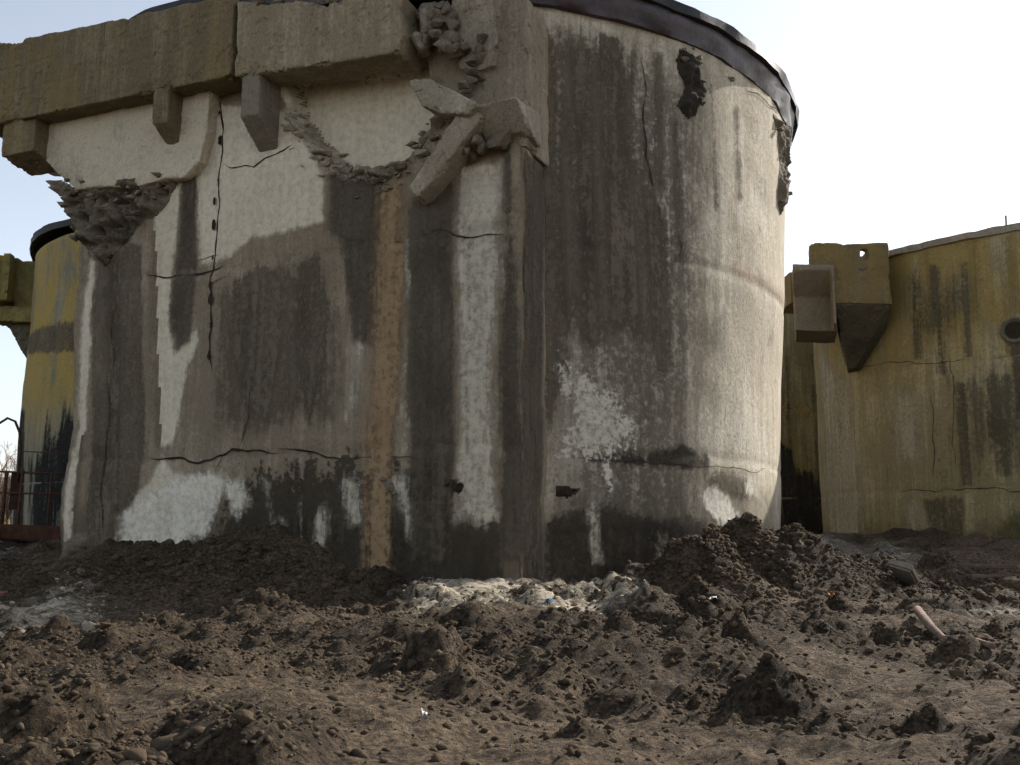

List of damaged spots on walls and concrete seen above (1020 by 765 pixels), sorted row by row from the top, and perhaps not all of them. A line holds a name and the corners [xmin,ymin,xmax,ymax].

leakage [13,410,60,526]
spalling [46,172,199,560]
leakage [87,243,248,549]
leakage [170,177,196,350]
crack [146,104,300,369]
crack [151,380,411,466]
peeling [196,0,489,264]
rust [361,184,406,569]
leakage [391,182,454,564]
leakage [498,30,757,583]
spalling [676,47,707,120]
spalling [773,115,793,215]